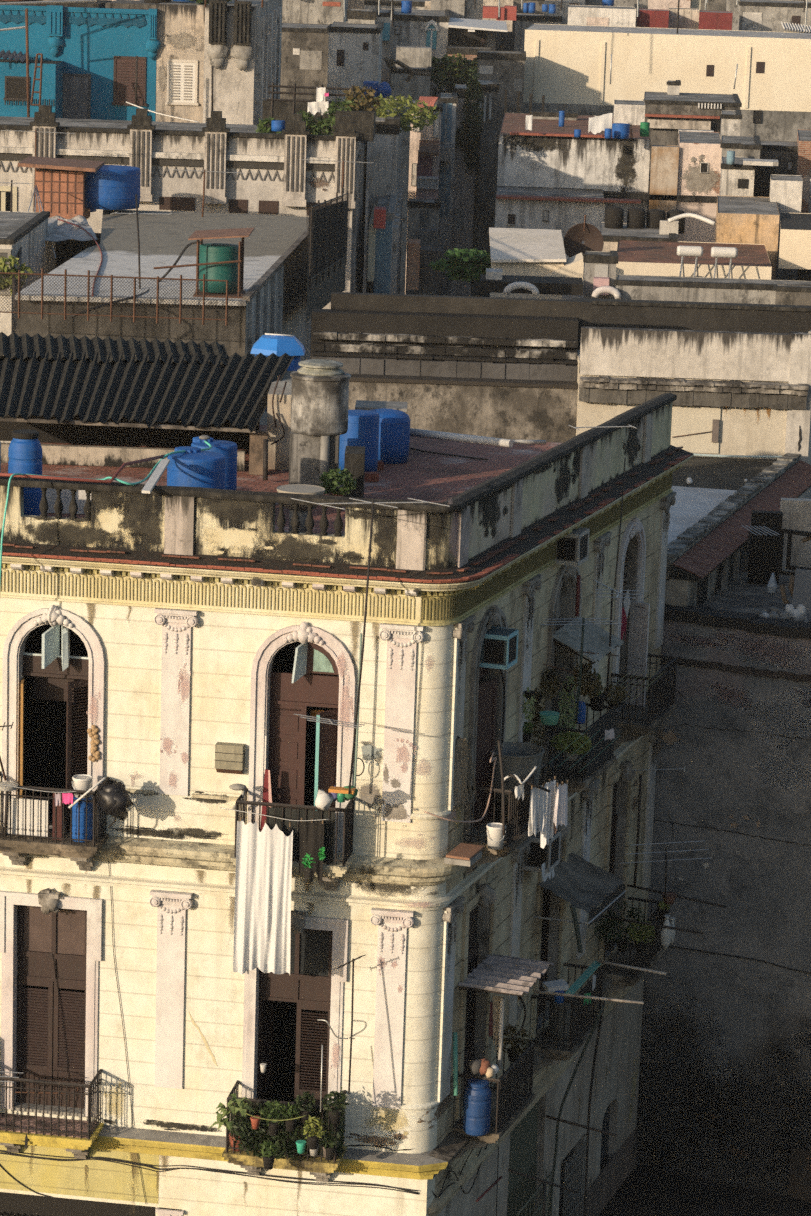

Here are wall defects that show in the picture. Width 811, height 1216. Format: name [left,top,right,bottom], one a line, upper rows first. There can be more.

damp [513,136,565,152]
damp [615,123,636,192]
damp [623,418,641,468]
damp [536,450,581,503]
damp [25,491,162,551]
damp [426,512,444,548]
damp [480,484,512,538]
peeling [160,738,188,764]
flaking render [358,739,416,826]
damp [639,1030,811,1170]